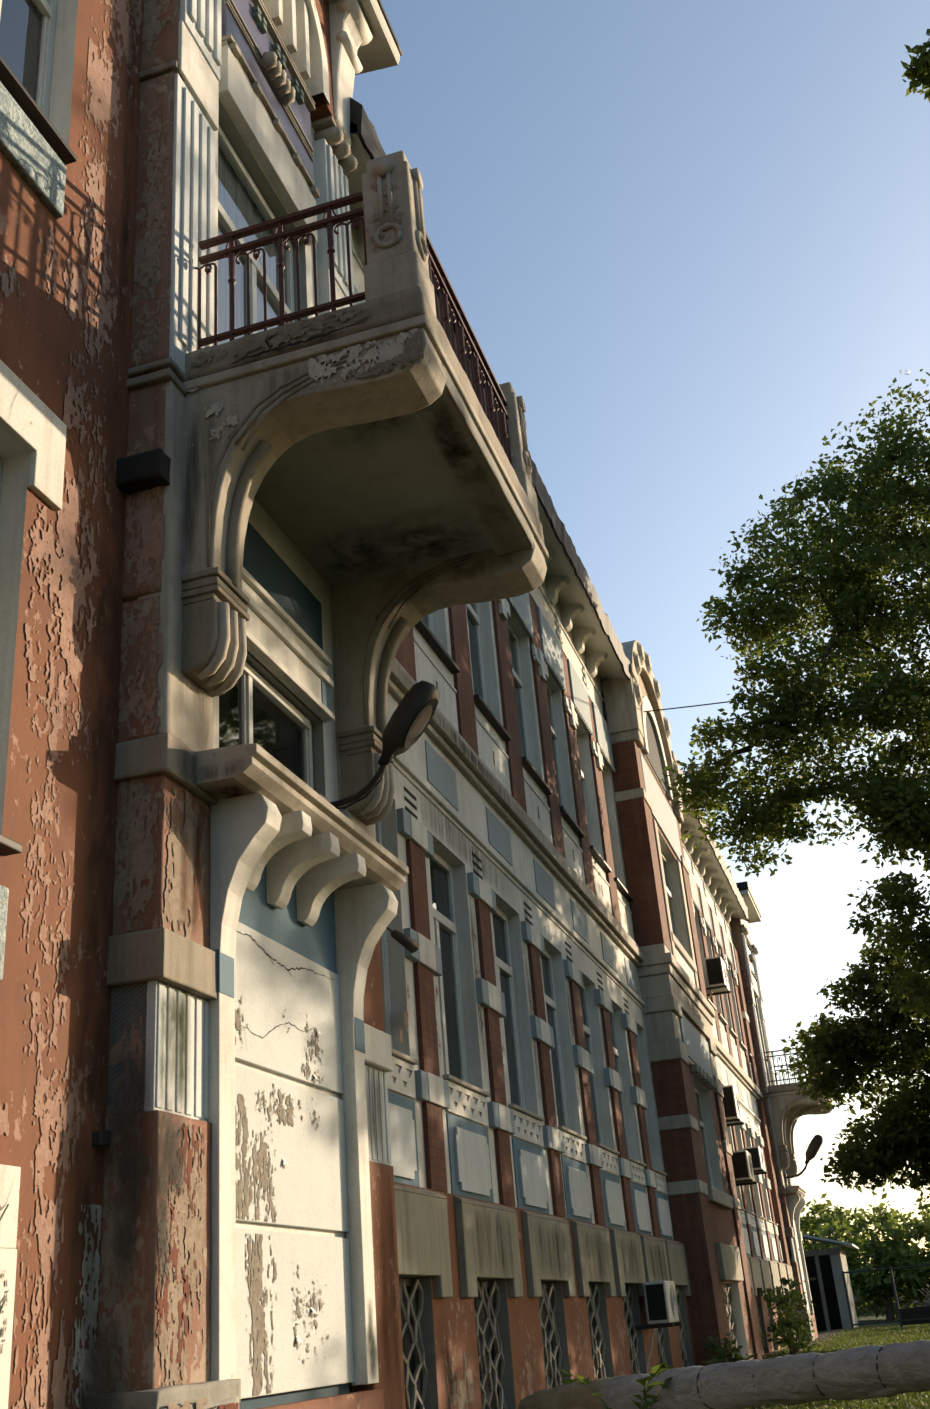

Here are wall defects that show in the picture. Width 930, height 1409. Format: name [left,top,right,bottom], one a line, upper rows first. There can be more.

spalling [191,298,383,369]
spalling [308,328,424,387]
flaking render [0,0,175,1409]
flaking render [113,777,204,940]
crack [237,931,329,979]
crack [241,1022,314,1044]
flaking render [156,1123,205,1387]